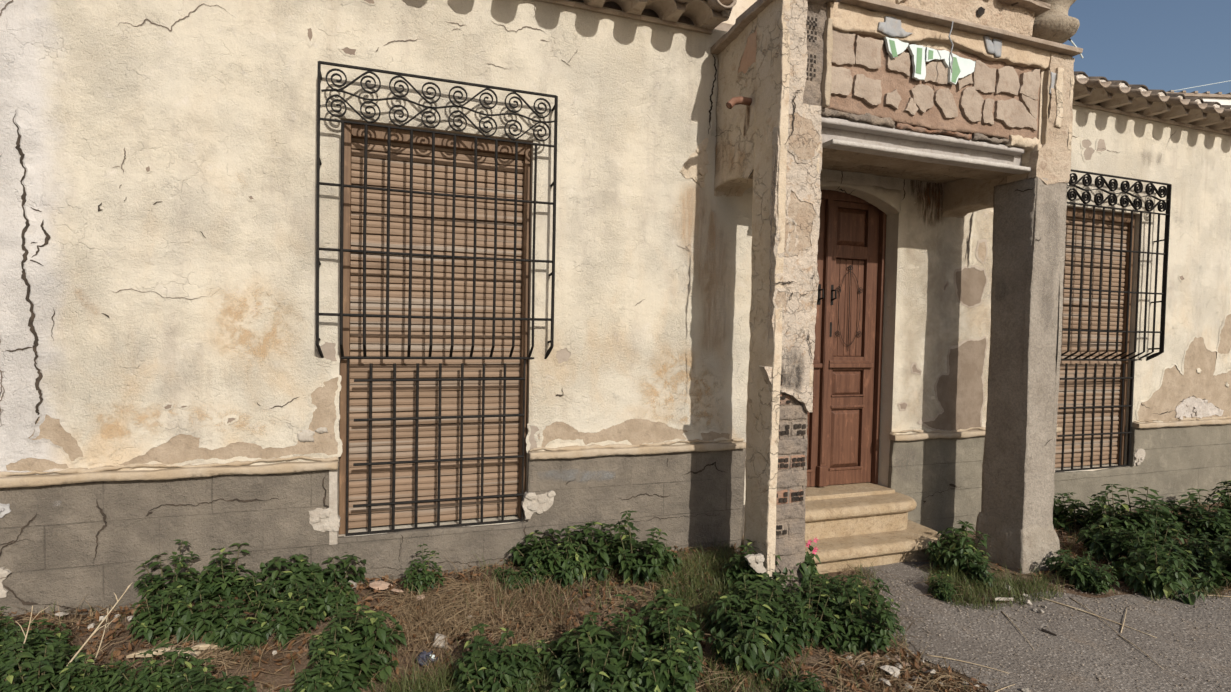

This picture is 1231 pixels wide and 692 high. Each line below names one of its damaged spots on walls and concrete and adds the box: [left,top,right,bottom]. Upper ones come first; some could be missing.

crack [112,3,233,31]
crack [0,109,55,439]
peeling [2,338,343,475]
peeling [526,416,732,453]
peeling [917,335,988,431]
peeling [1136,312,1231,423]
crack [93,499,107,563]